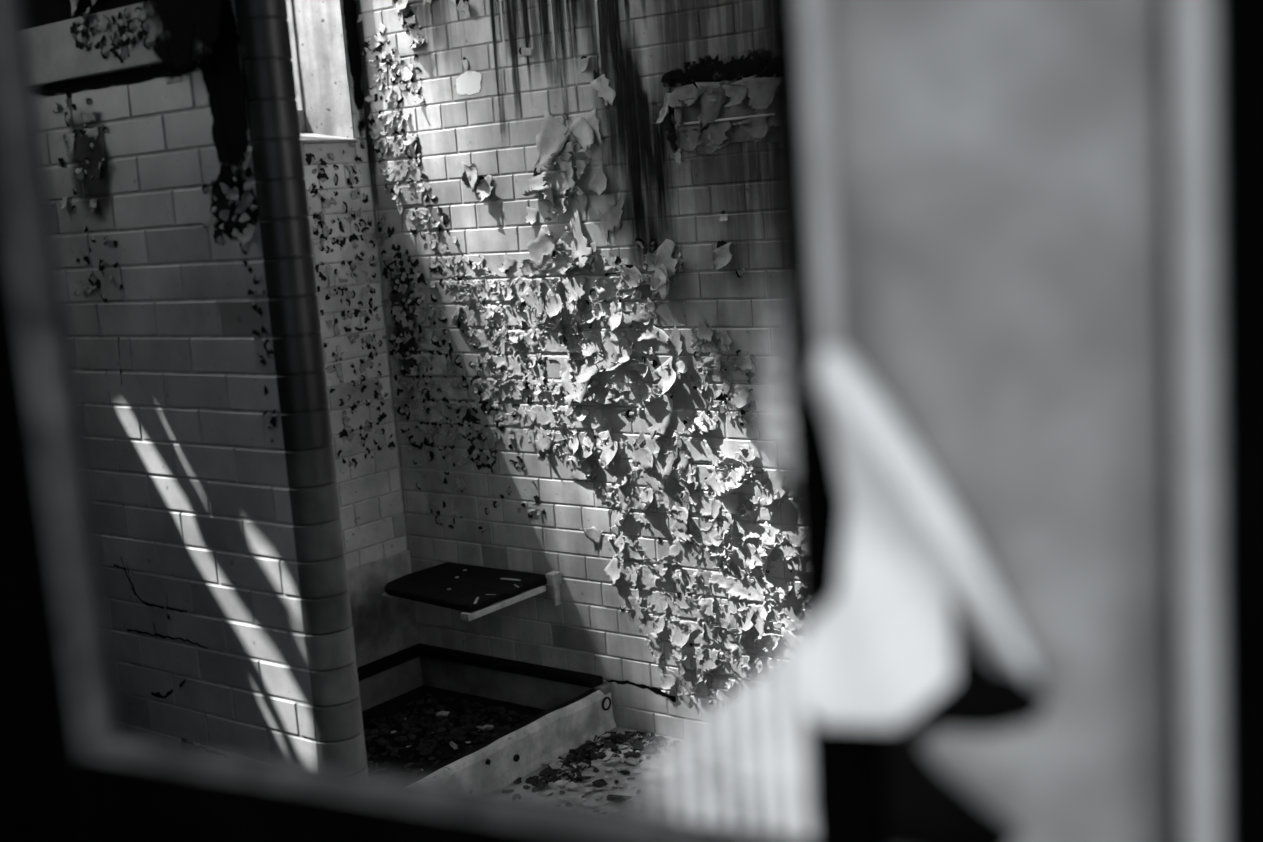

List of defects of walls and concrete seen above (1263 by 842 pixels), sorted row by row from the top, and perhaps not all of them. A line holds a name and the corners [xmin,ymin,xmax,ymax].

peeling [70,0,151,64]
peeling [51,92,123,302]
peeling [201,146,274,367]
peeling [305,0,801,705]
crack [114,555,209,649]
crack [151,678,186,699]